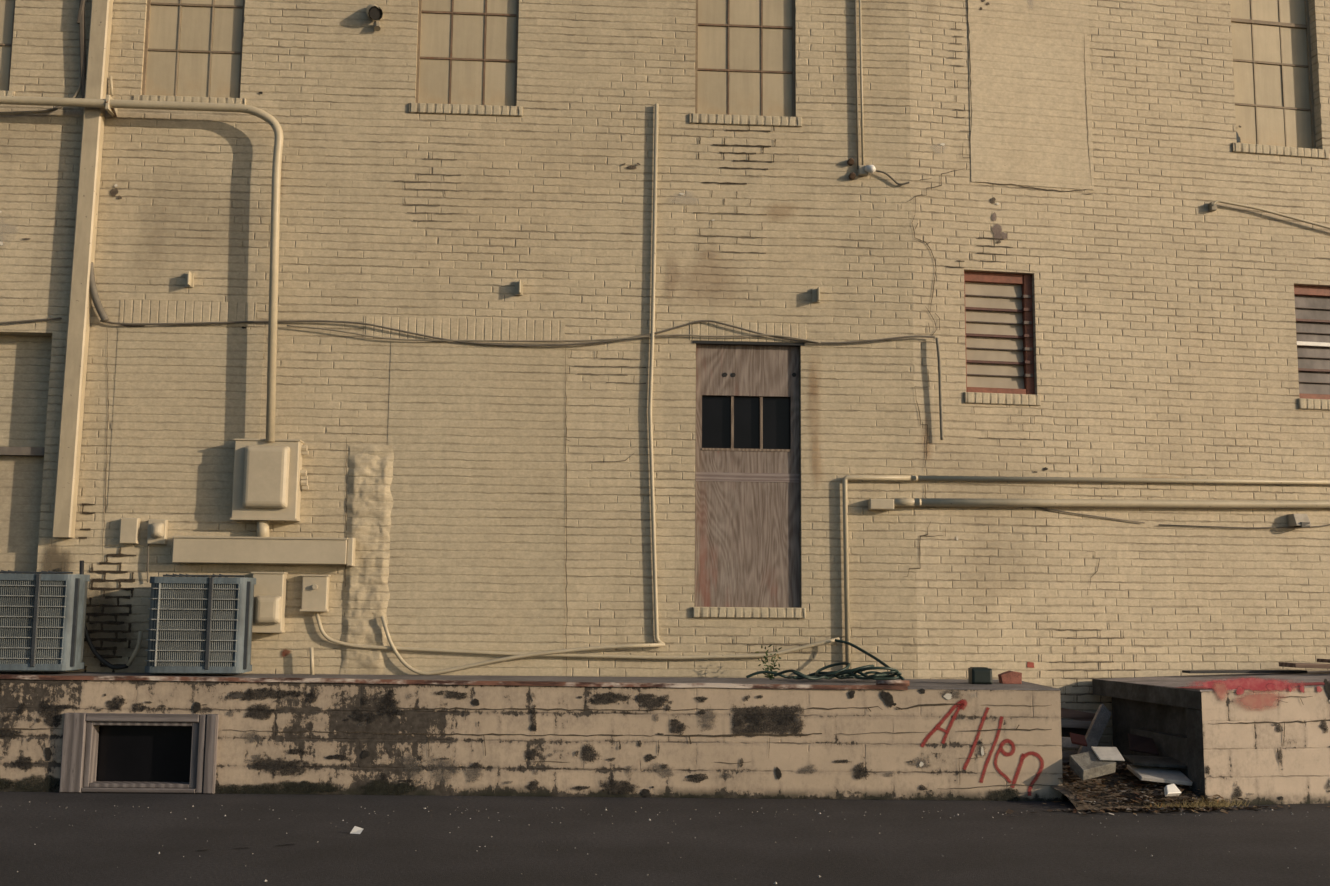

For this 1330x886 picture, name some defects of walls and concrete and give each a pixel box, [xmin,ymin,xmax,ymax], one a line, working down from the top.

crack [905,0,1093,340]
crack [906,375,946,577]
spalling [84,547,136,672]
water stain [0,775,60,792]
water stain [215,781,337,794]
water stain [361,779,417,795]
water stain [989,788,1019,801]